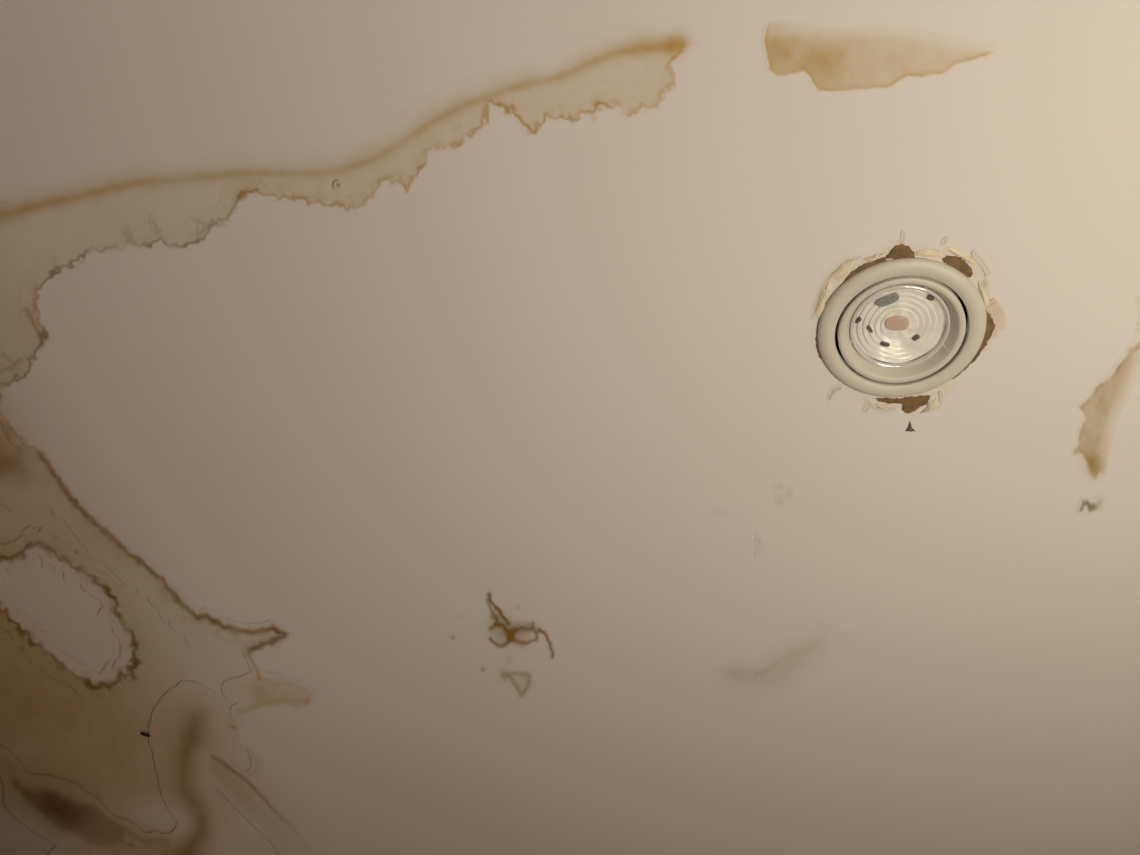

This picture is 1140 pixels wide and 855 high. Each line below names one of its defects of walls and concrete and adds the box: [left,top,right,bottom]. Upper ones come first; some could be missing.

leakage [762,18,998,94]
leakage [0,19,703,855]
peeling [809,230,1008,432]
leakage [1071,296,1140,516]